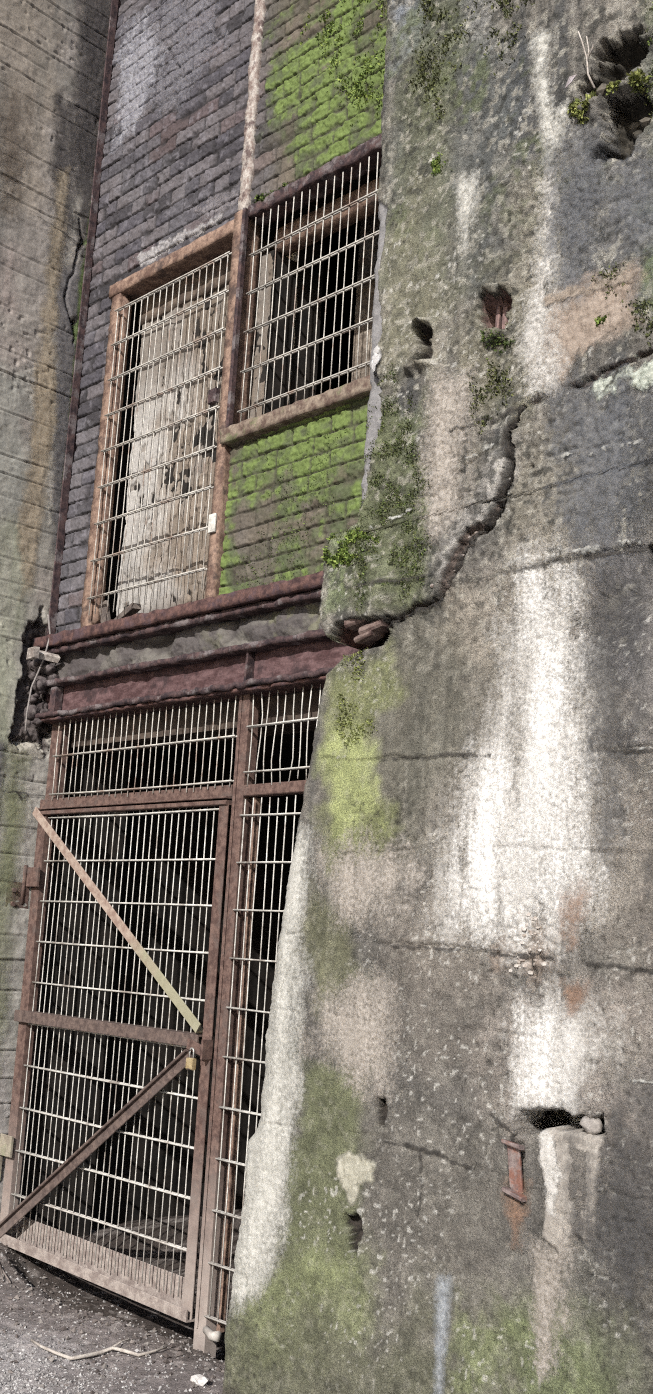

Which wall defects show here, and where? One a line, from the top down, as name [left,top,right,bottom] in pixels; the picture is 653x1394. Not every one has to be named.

damp [520,32,653,553]
crack [347,347,653,657]
spalling [2,618,60,781]
spalling [338,618,392,649]
damp [441,555,608,956]
damp [511,999,603,1125]
damp [538,1130,561,1215]
peeling [539,1125,607,1253]
damp [437,1277,449,1394]
efflorescence [533,1241,574,1378]